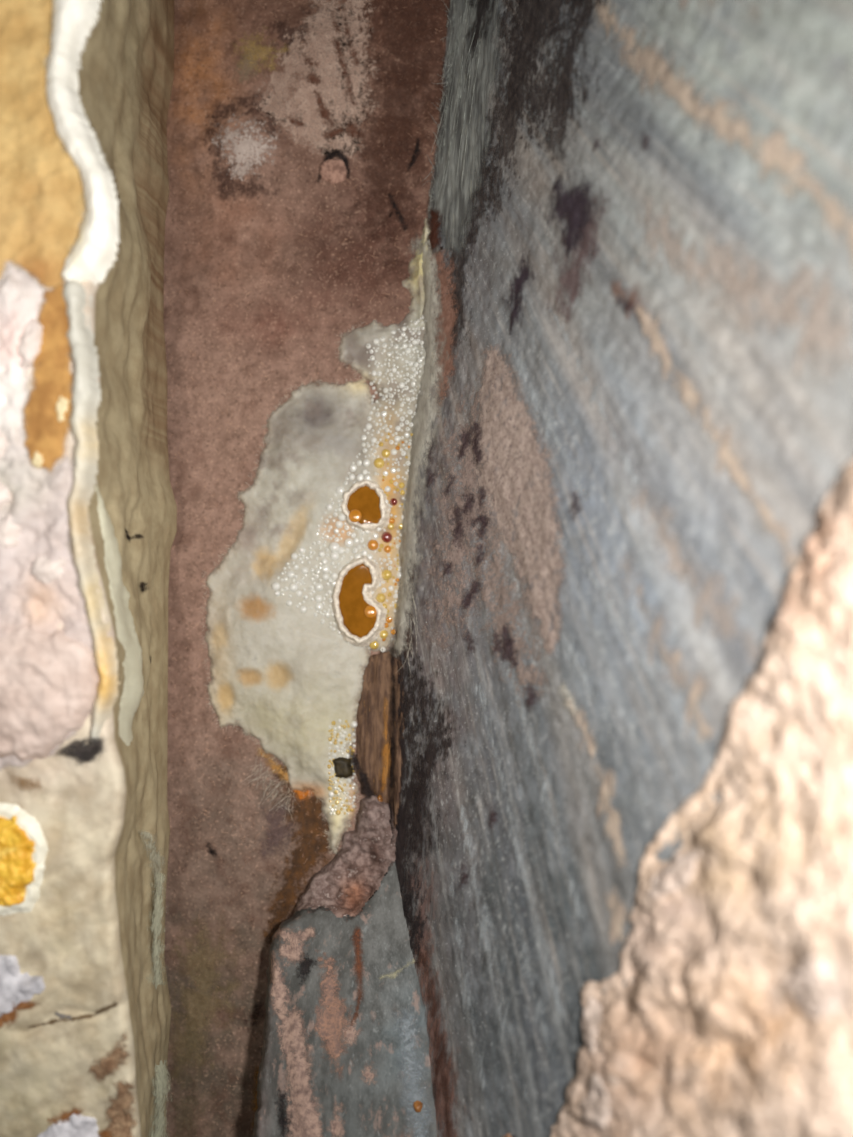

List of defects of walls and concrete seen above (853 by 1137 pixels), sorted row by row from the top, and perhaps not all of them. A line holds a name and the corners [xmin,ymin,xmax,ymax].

leakage [443,0,853,352]
peeling [0,0,144,746]
leakage [446,477,489,565]
leakage [459,422,482,463]
leakage [462,581,481,608]
leakage [494,625,518,667]
leakage [548,176,606,413]
corrosion [260,749,332,943]
spalling [550,460,853,1137]